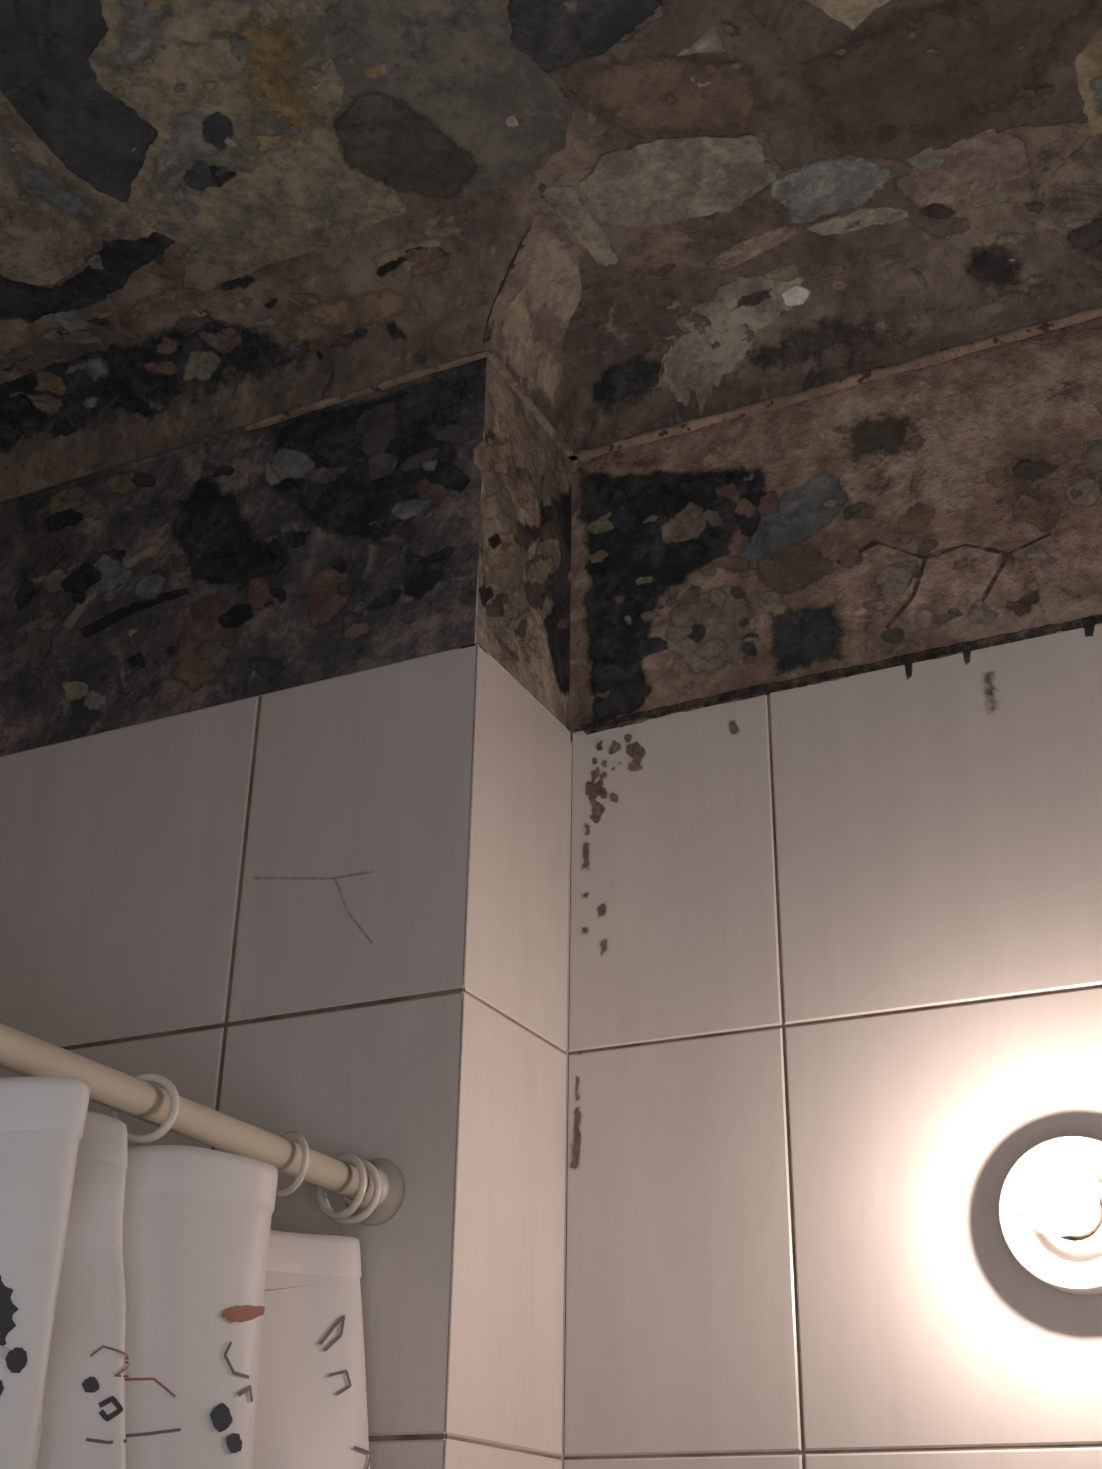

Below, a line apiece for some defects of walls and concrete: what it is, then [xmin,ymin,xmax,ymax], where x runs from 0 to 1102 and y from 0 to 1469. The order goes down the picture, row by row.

peeling [1075,27,1102,137]
peeling [0,0,1044,417]
peeling [1064,212,1102,250]
leakage [274,380,467,540]
leakage [836,413,914,462]
leakage [172,476,288,584]
leakage [540,467,766,723]
leakage [769,604,844,673]
leakage [583,734,645,868]
crack [253,870,374,944]
leakage [582,893,607,955]
leakage [570,1076,581,1169]